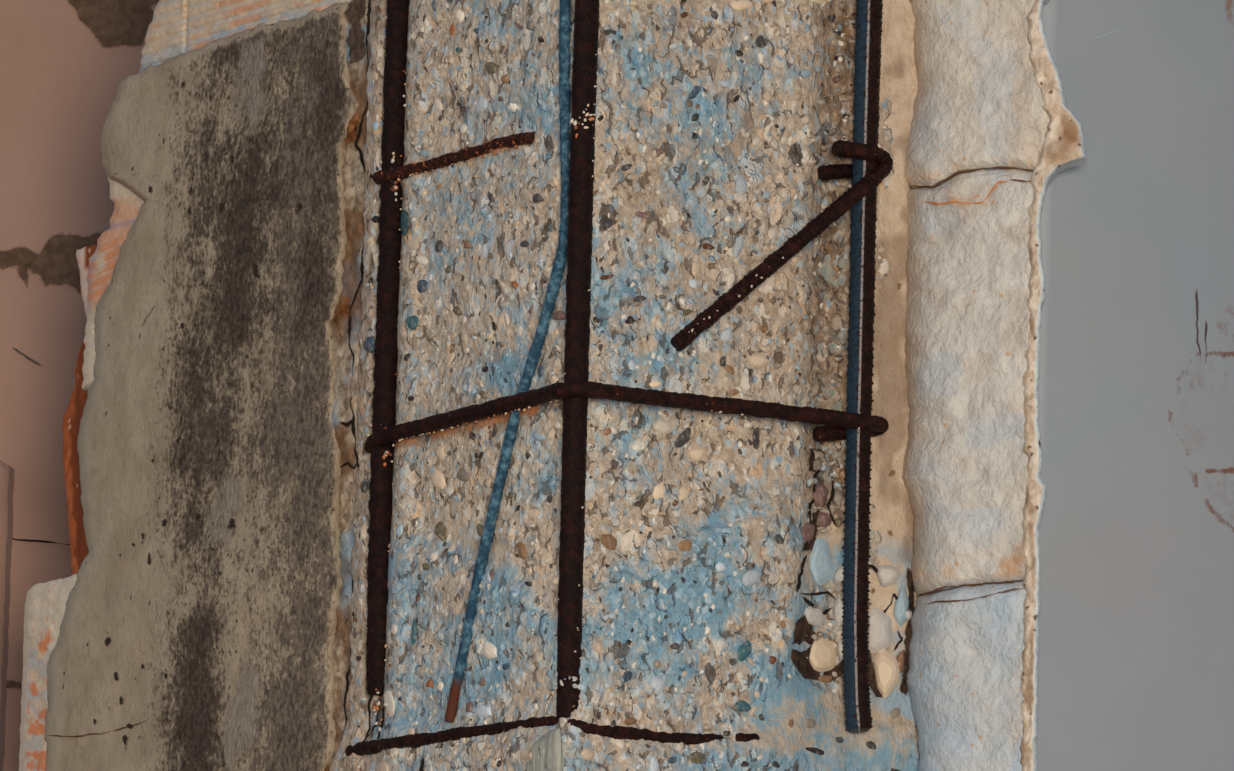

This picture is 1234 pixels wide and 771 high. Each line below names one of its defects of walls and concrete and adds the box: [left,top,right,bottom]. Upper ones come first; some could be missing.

peeling [68,0,159,47]
crack [347,0,371,176]
crack [912,166,1034,205]
damp [151,12,355,771]
crack [340,244,364,469]
rust [395,405,540,450]
spalling [329,0,920,771]
crack [911,581,1025,604]